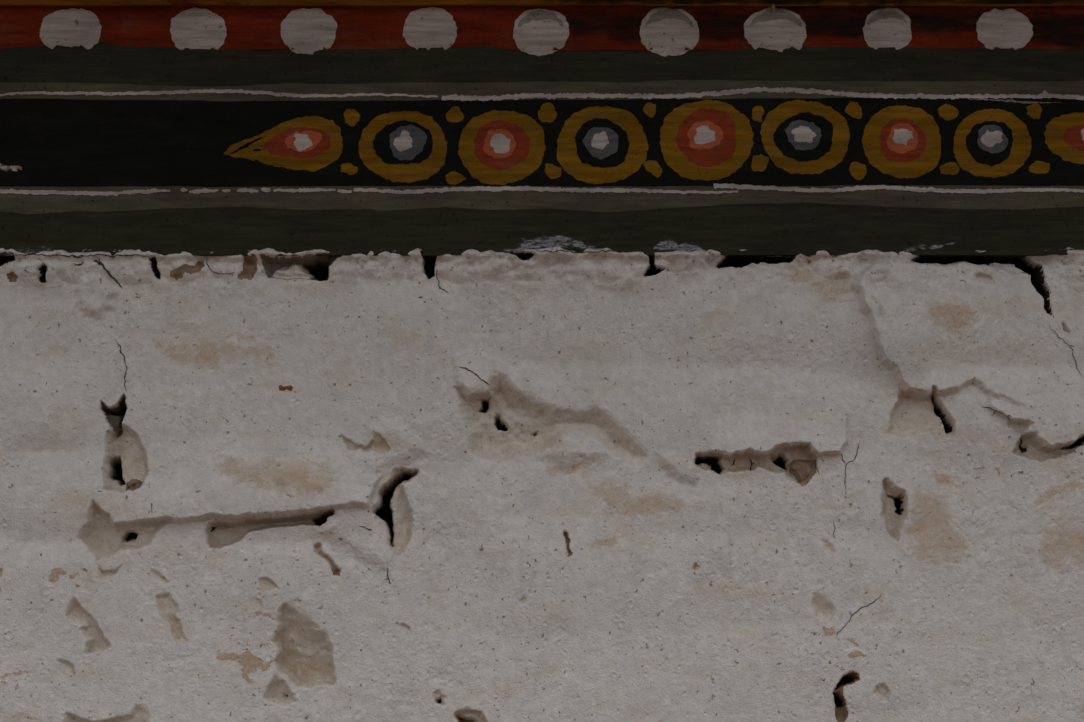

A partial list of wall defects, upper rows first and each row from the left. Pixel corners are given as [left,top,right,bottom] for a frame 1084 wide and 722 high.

peeling [170,261,205,281]
spalling [237,254,341,281]
spalling [101,395,127,432]
spalling [456,372,647,467]
spalling [695,445,818,487]
spalling [881,479,908,542]
spalling [79,501,171,580]
spalling [67,597,111,655]
spalling [217,577,336,707]
spalling [812,589,865,658]
spalling [64,703,151,722]
spalling [833,672,860,722]